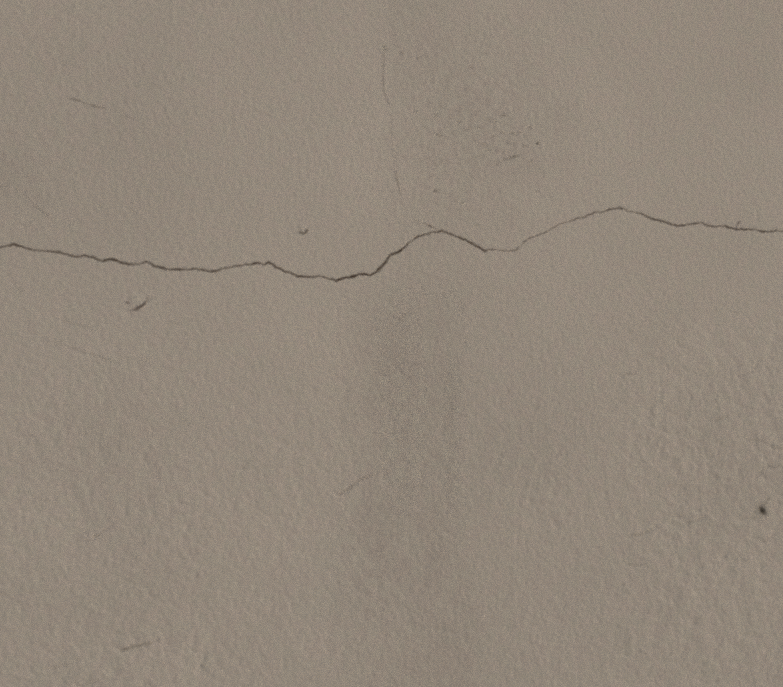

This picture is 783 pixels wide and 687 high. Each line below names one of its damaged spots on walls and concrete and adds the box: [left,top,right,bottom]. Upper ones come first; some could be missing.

crack [240,261,309,278]
crack [332,230,485,281]